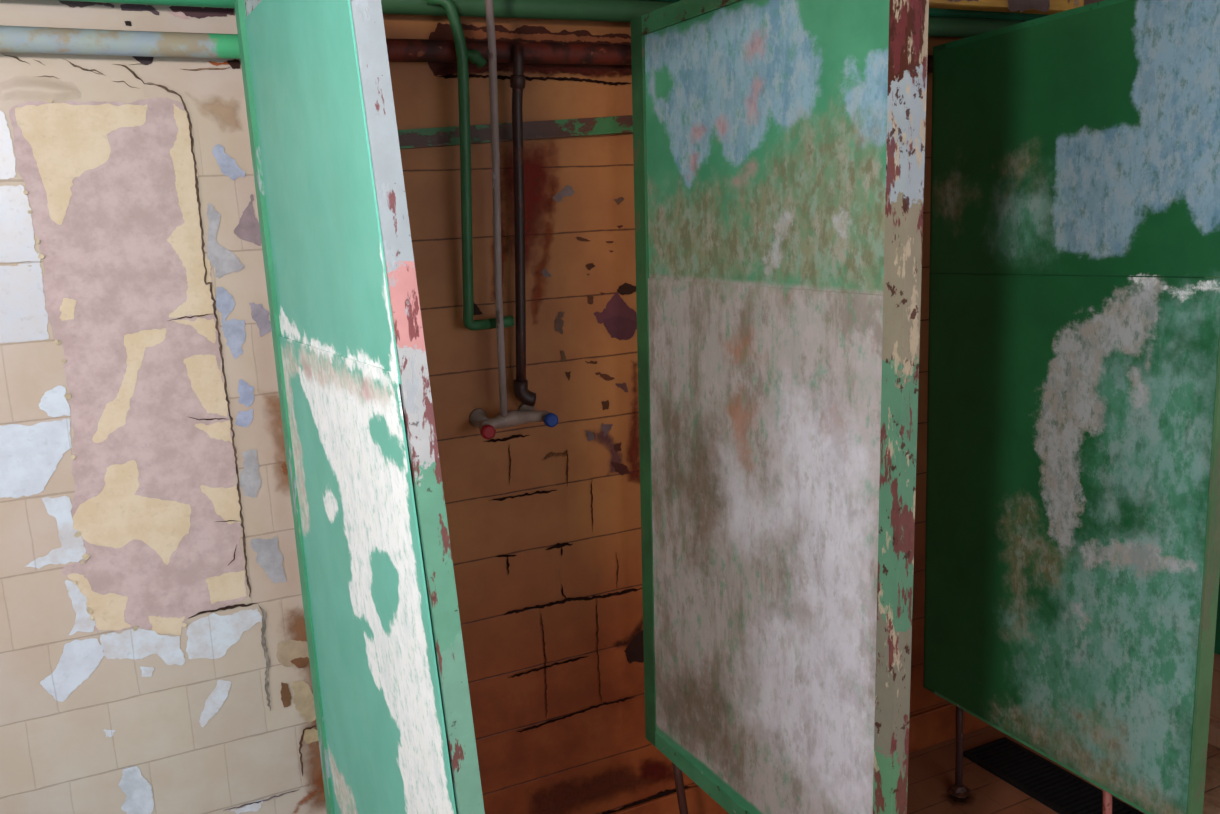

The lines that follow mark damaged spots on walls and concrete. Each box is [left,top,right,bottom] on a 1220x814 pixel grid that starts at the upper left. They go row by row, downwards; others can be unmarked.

corrosion [492,151,554,313]
flaking render [587,283,637,340]
crack [5,55,271,710]
flaking render [0,97,286,702]
peeling [585,360,628,392]
peeling [585,400,631,475]
crack [484,434,593,555]
crack [496,555,517,574]
peeling [199,680,232,727]
flaking render [276,639,319,744]
crack [503,556,642,733]
crack [602,786,692,814]